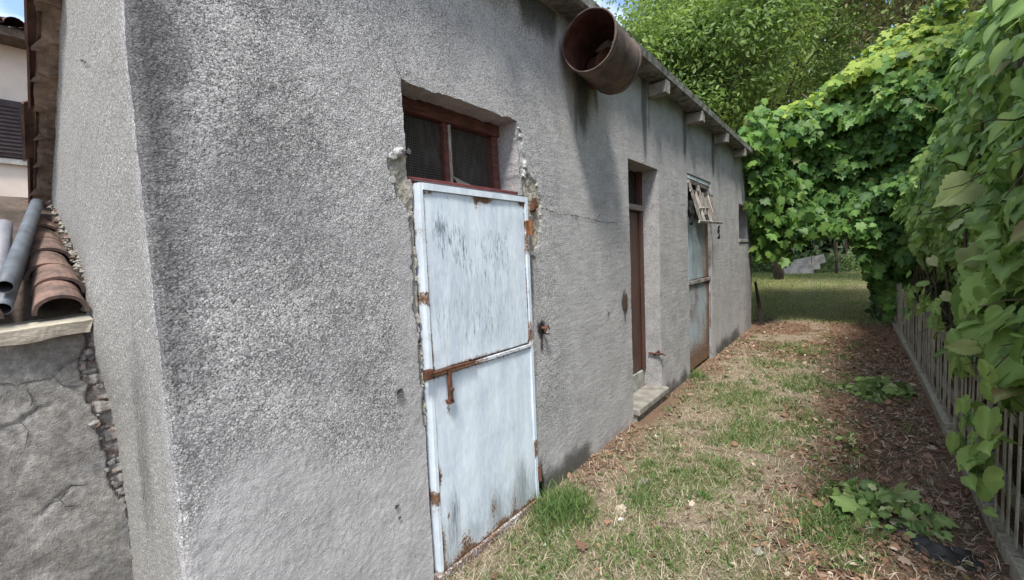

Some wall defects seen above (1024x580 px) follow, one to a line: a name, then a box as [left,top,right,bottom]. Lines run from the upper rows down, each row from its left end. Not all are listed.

spalling [517,127,542,256]
crack [542,208,619,224]
spalling [388,147,426,425]
crack [0,358,79,451]
crack [41,484,88,516]